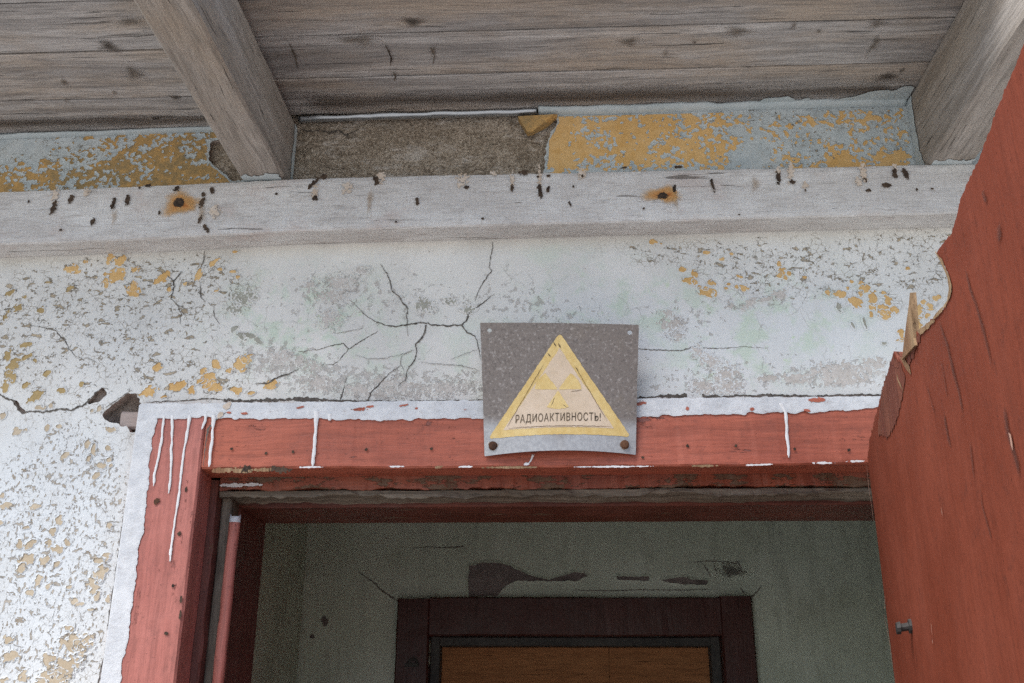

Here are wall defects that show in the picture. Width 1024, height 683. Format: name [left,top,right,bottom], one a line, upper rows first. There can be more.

peeling [0,132,243,233]
rust [165,192,199,215]
flaking render [291,107,918,201]
rust [645,187,677,202]
peeling [677,260,809,311]
crack [0,242,494,413]
peeling [0,340,85,437]
peeling [212,467,271,487]
peeling [15,513,73,599]
peeling [65,551,113,612]
flaking render [465,559,590,597]
peeling [0,624,97,683]